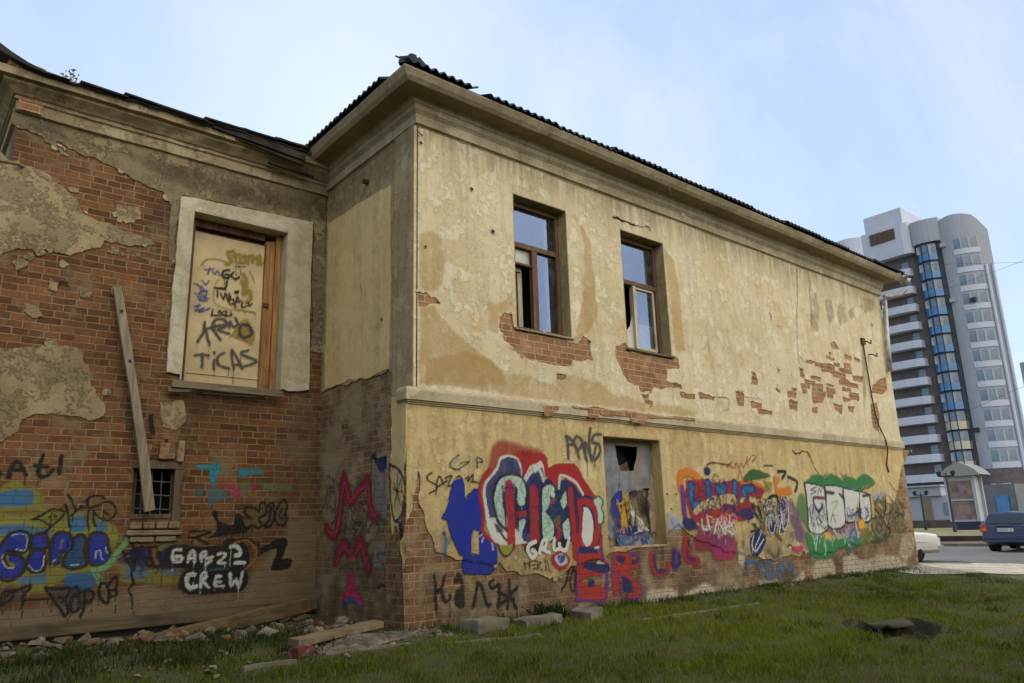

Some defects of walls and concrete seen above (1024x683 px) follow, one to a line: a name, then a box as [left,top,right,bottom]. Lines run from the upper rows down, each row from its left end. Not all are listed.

spalling [17,95,44,115]
spalling [416,289,441,307]
spalling [0,129,319,626]
spalling [499,312,593,381]
spalling [572,343,714,424]
spalling [735,371,772,415]
spalling [775,341,887,431]
spalling [400,450,919,630]